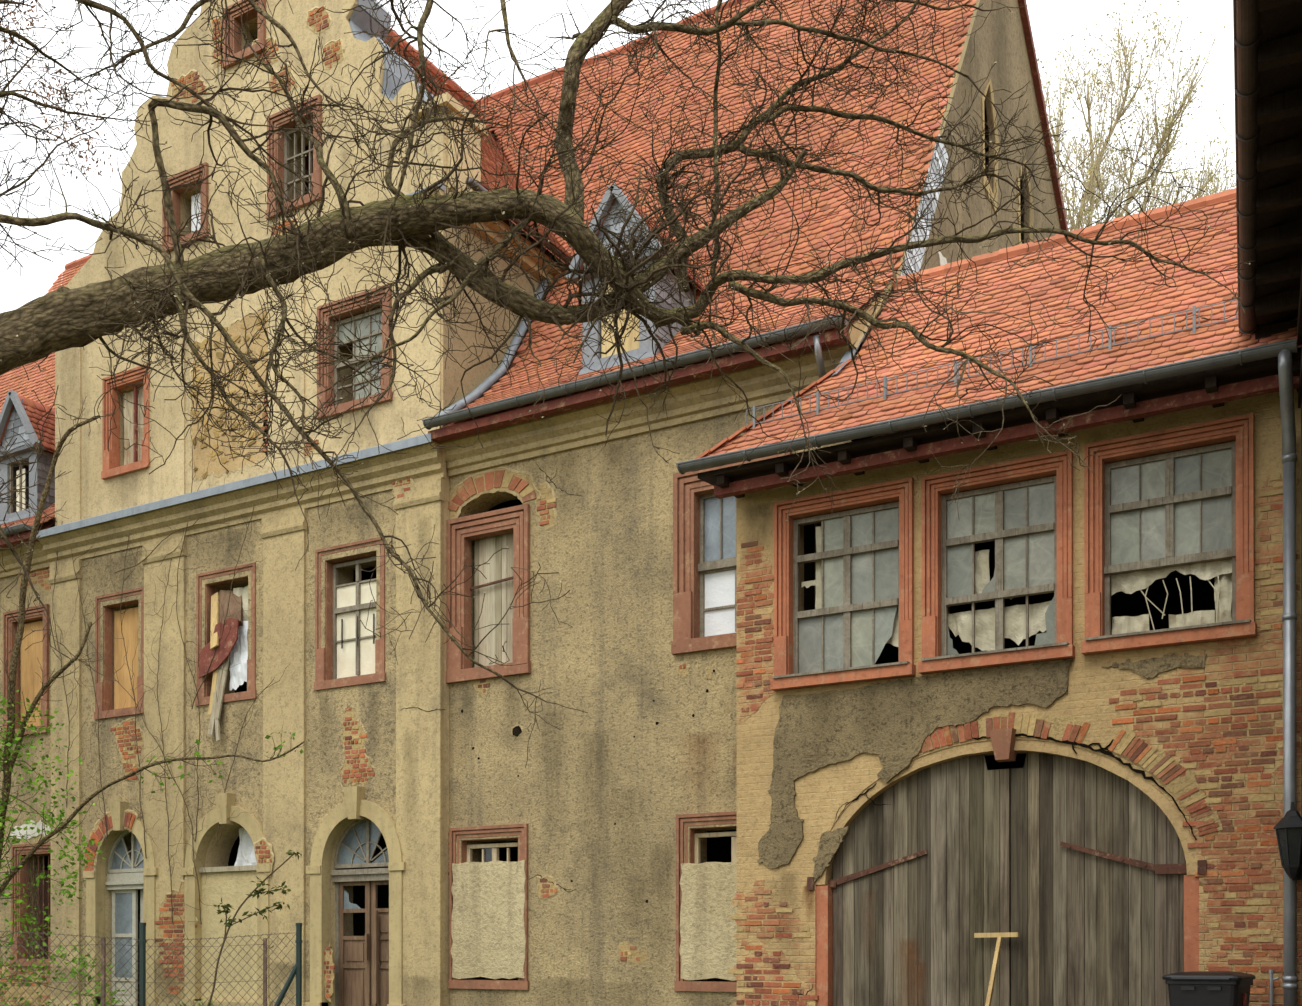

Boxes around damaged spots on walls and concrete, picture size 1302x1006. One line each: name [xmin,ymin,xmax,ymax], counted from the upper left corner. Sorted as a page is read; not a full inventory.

spalling [110,716,144,783]
spalling [339,705,376,787]
flaking render [727,538,1090,1006]
crack [972,733,1197,840]
spalling [1106,653,1301,1006]
spalling [155,880,198,1001]